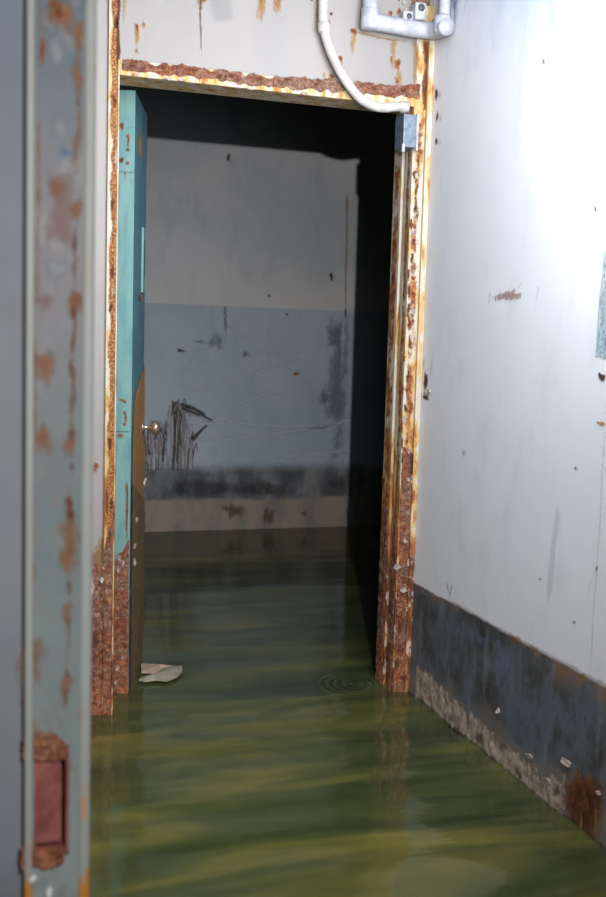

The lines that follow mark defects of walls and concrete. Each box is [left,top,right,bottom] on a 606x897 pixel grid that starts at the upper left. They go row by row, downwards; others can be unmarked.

rust [48,0,84,51]
rust [70,292,83,349]
rust [34,344,54,381]
rust [64,362,76,452]
rust [90,0,431,765]
rust [60,495,76,568]
rust [22,731,69,762]
rust [563,771,605,846]
rust [20,847,66,882]